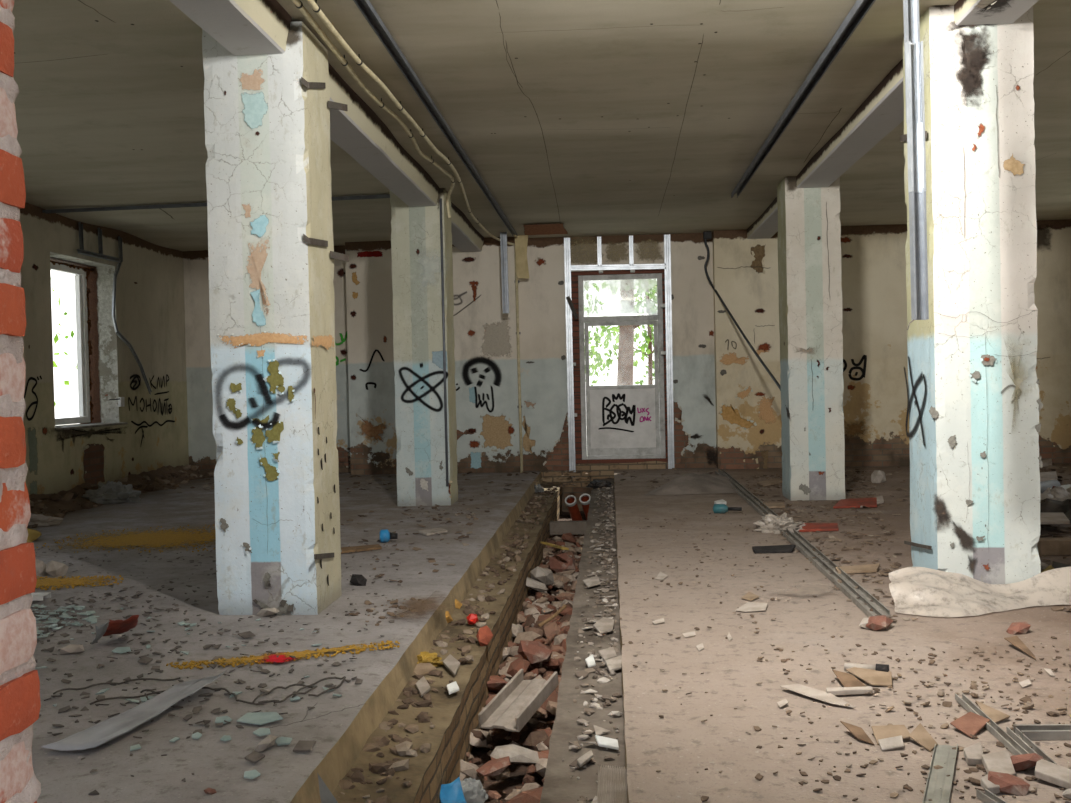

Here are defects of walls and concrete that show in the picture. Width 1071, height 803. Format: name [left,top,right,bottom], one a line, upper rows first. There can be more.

water stain [951,22,993,104]
peeling [238,69,268,129]
crack [496,0,664,219]
peeling [217,204,334,403]
flaking render [318,427,351,470]
peeling [356,413,387,442]
flaking render [720,446,760,469]
peeling [720,386,776,430]
water stain [953,522,977,573]